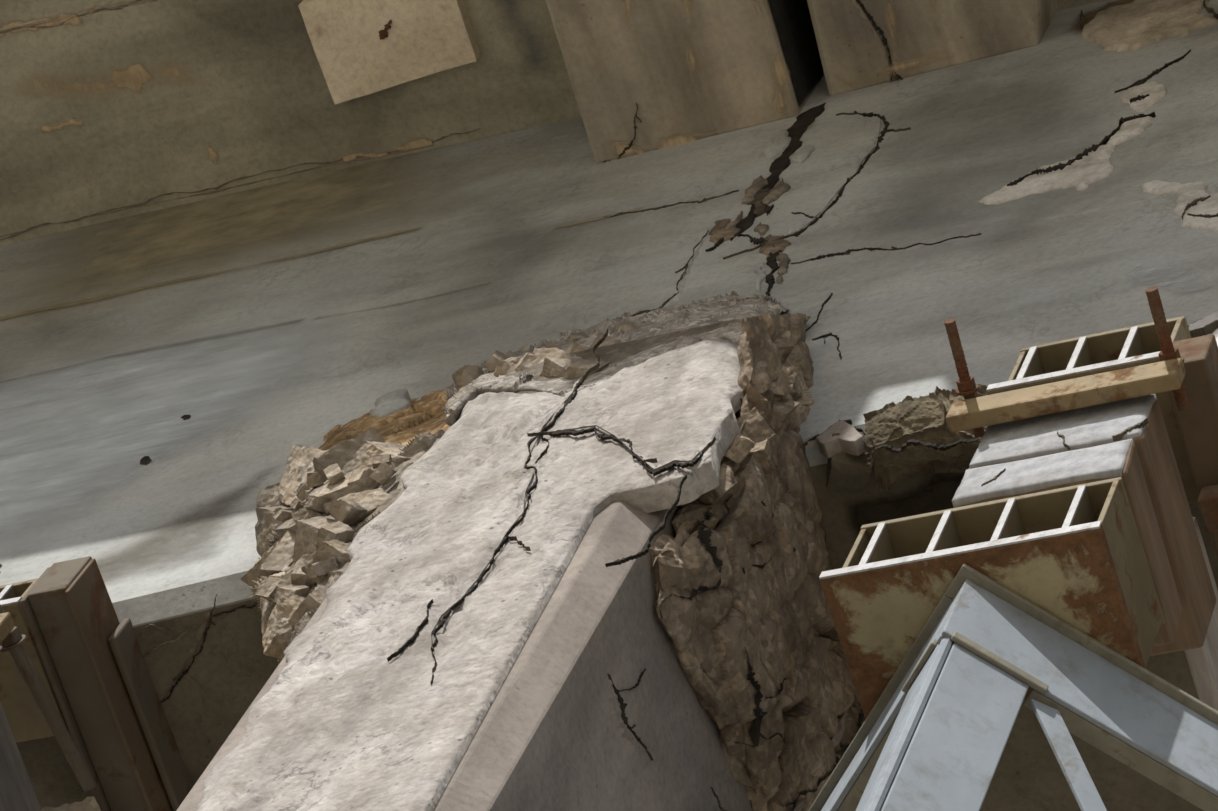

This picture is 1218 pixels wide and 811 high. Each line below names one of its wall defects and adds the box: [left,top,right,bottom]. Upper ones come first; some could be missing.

crack [851,0,903,82]
spalling [978,0,1218,206]
peeling [1134,180,1218,232]
spalling [1188,311,1218,345]
crack [387,102,981,686]
spalling [240,291,789,664]
crack [142,594,257,703]
crack [607,668,653,761]
crack [733,647,788,749]
crack [764,708,864,807]